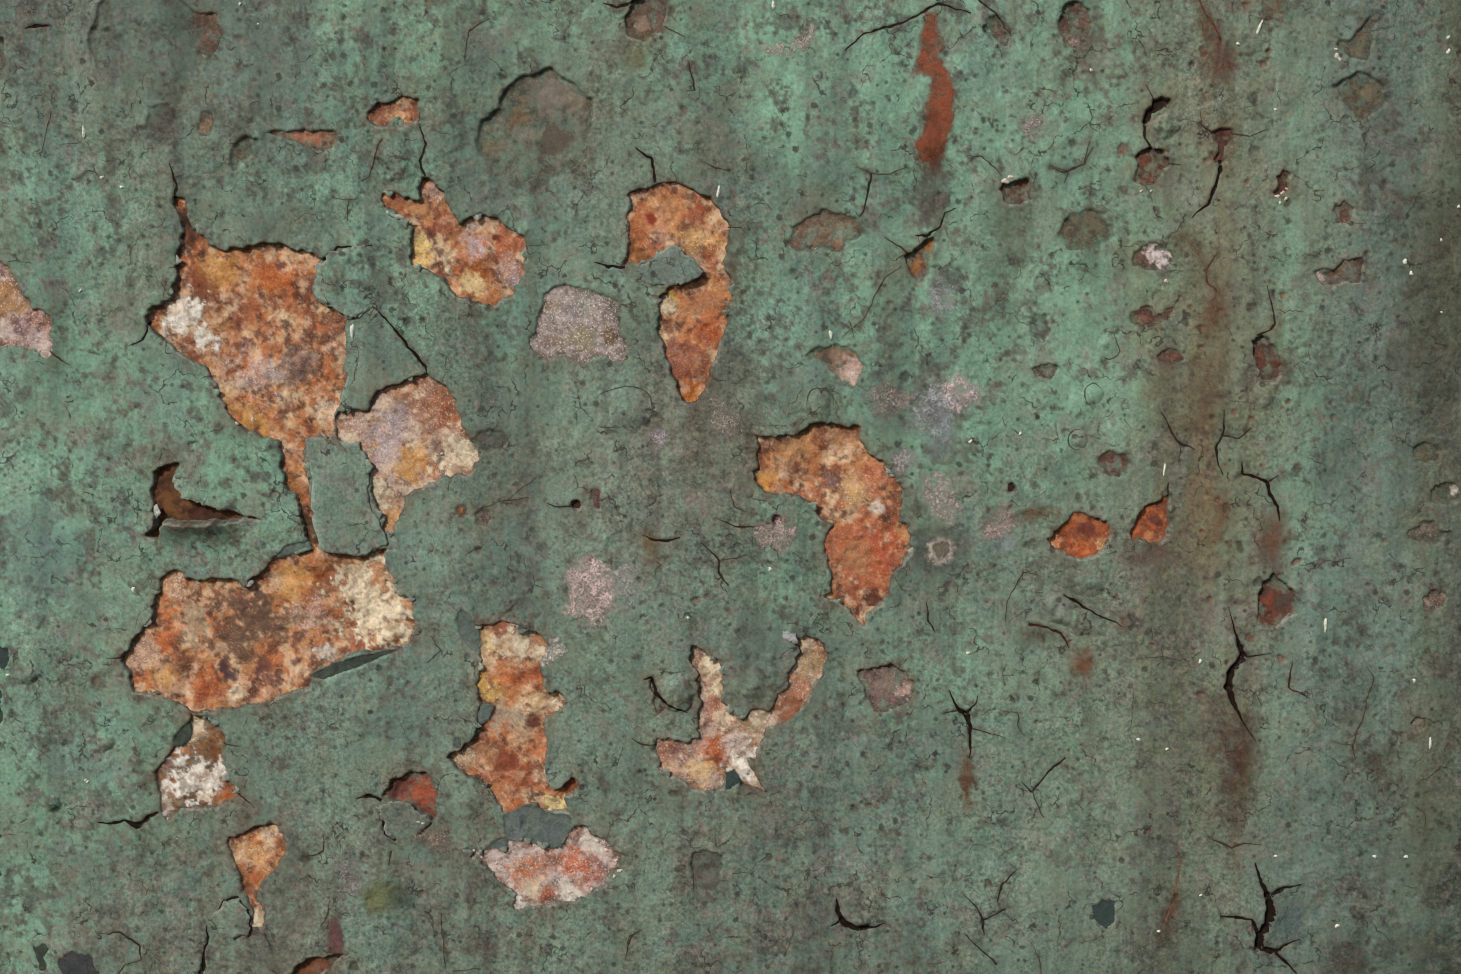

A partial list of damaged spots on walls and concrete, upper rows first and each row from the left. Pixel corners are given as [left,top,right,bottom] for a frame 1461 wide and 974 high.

corrosion [916,13,955,220]
peeling [0,263,53,358]
peeling [382,179,528,306]
peeling [625,183,735,402]
peeling [124,197,505,820]
peeling [754,423,915,626]
peeling [451,609,623,910]
peeling [655,631,827,791]
crack [1223,607,1309,741]
peeling [213,824,286,940]
crack [1156,841,1182,944]
crack [1211,839,1323,974]